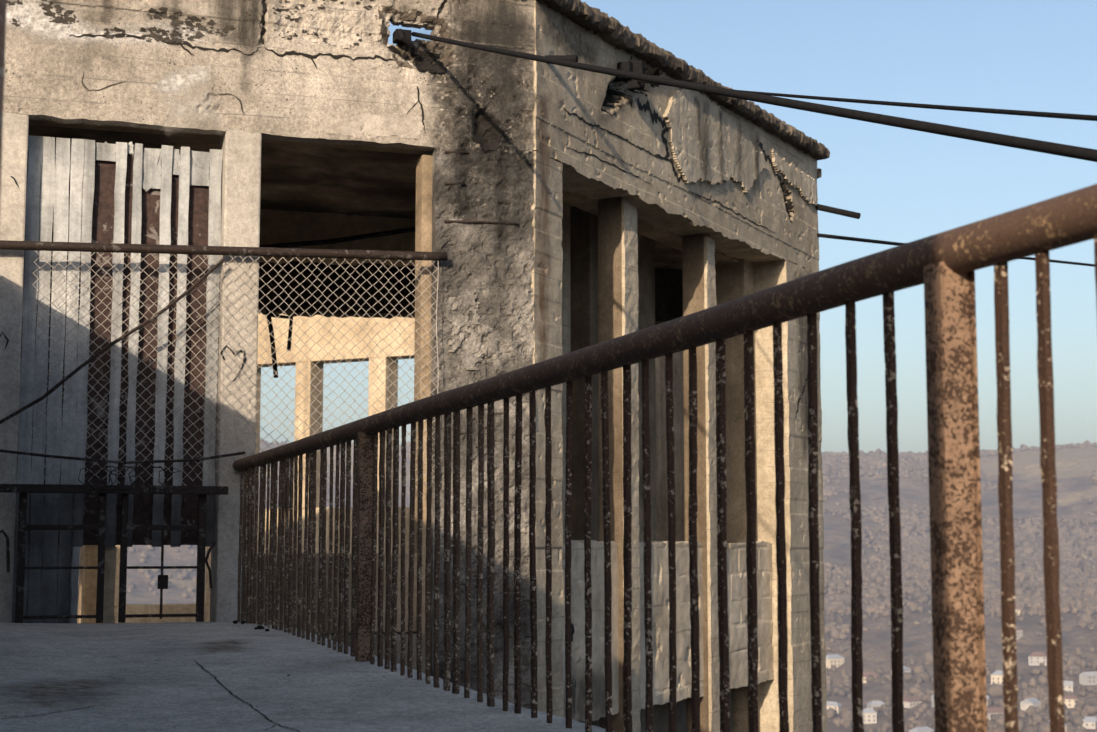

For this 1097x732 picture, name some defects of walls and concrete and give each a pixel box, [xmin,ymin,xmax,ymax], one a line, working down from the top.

crack [70,0,396,68]
damp [221,0,258,45]
spalling [271,0,453,73]
crack [433,0,447,26]
crack [81,72,126,91]
crack [218,93,244,114]
crack [406,86,426,134]
spalling [601,67,662,112]
crack [565,92,794,233]
peeling [663,88,818,222]
crack [194,659,301,732]